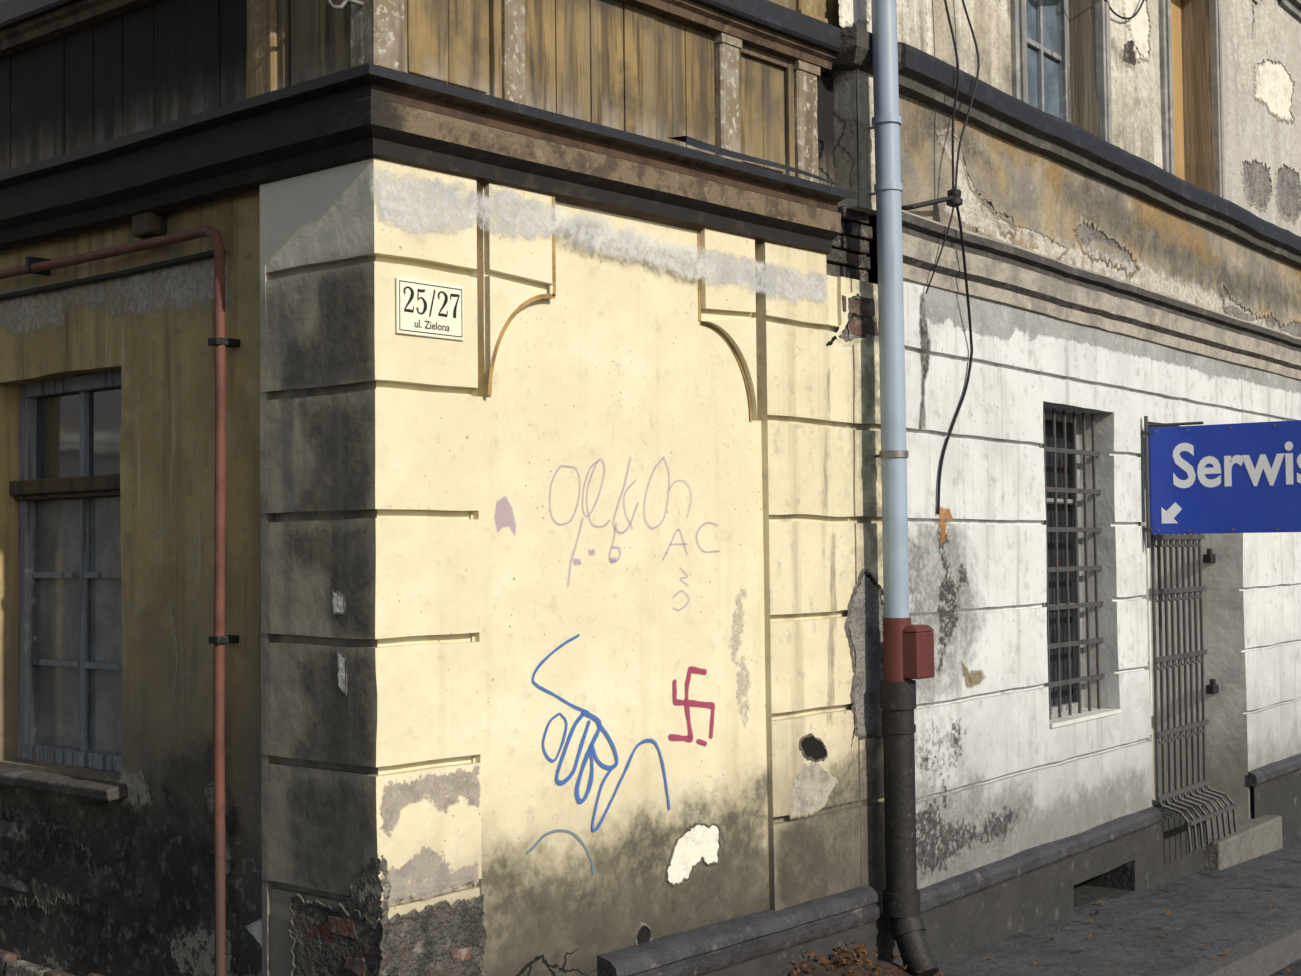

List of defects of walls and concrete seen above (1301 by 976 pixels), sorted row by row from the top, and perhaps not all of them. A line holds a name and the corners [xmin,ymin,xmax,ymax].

peeling [1121,0,1151,70]
peeling [936,126,1141,279]
spalling [1240,157,1301,225]
rust [939,508,953,545]
damp [909,521,968,671]
spalling [844,568,884,740]
damp [117,764,152,808]
peeling [789,733,838,820]
damp [916,751,1148,882]
spalling [665,823,721,887]
damp [171,922,232,976]
crack [516,948,598,976]